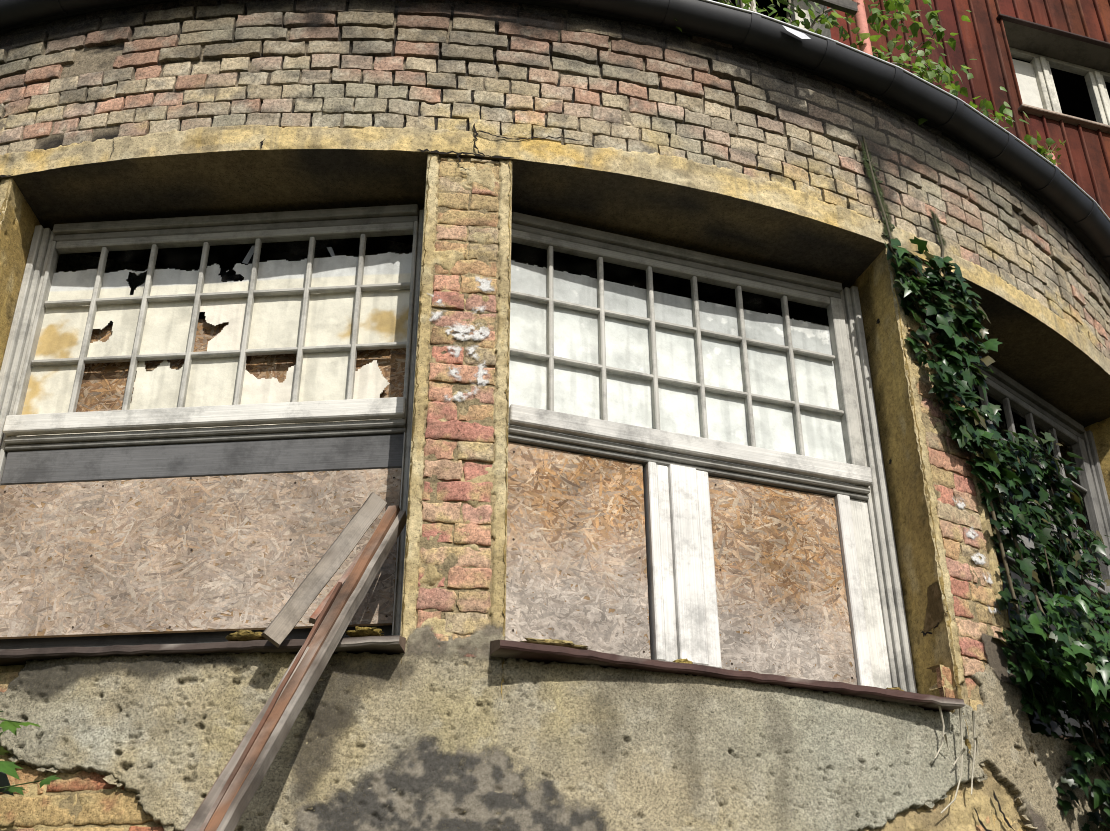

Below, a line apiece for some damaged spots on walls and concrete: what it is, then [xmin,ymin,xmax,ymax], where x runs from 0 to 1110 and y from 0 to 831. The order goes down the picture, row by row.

crack [417,123,584,170]
flaking render [0,665,24,695]
leakage [293,654,606,831]
flaking render [0,752,175,831]
flaking render [862,762,1037,831]